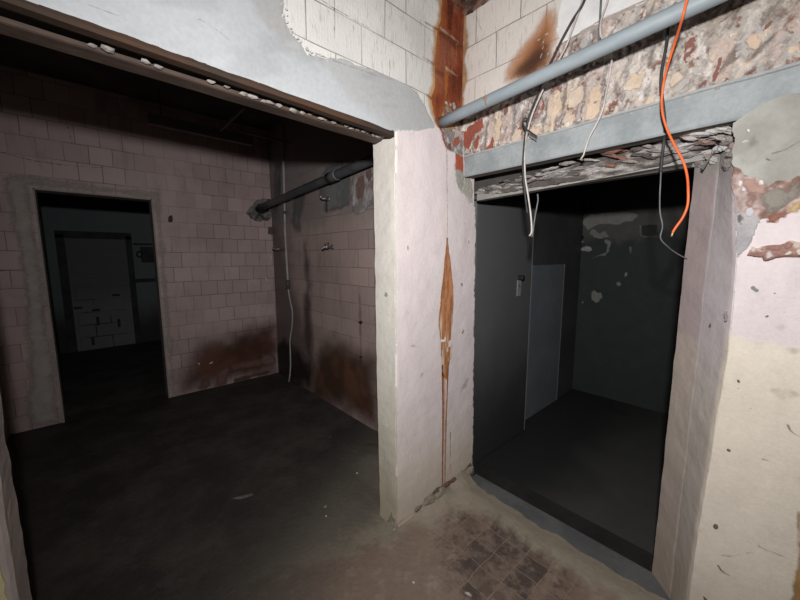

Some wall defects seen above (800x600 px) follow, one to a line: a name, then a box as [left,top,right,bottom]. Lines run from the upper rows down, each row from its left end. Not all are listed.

rust [429,0,468,130]
rust [508,15,554,79]
flaking render [441,0,800,203]
peeling [350,165,374,214]
leakage [188,294,373,418]
rust [439,238,454,485]